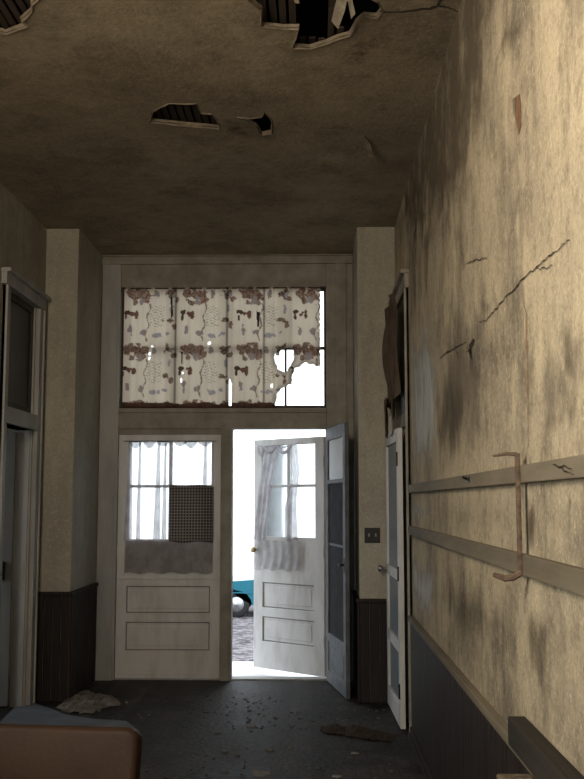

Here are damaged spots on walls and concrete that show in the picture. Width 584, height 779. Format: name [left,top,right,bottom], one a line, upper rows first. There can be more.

spalling [247,0,384,50]
spalling [148,103,221,130]
crack [479,239,569,332]